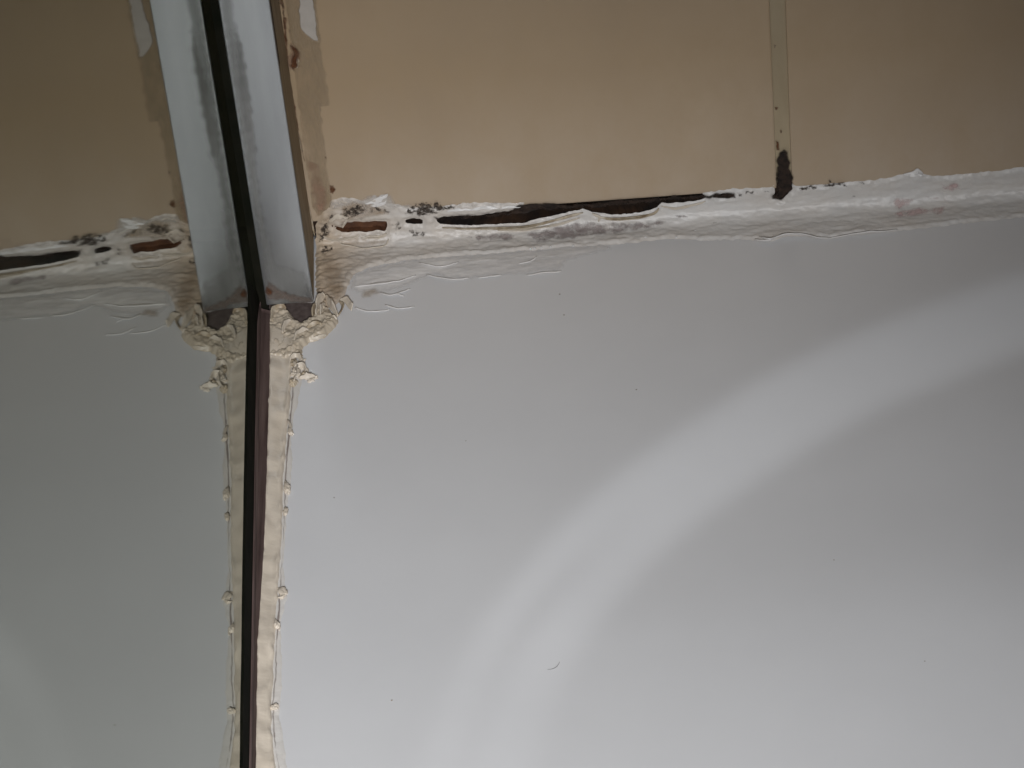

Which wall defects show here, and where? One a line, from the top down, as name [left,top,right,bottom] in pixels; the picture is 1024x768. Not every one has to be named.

leakage [772,150,845,200]
peeling [365,194,388,207]